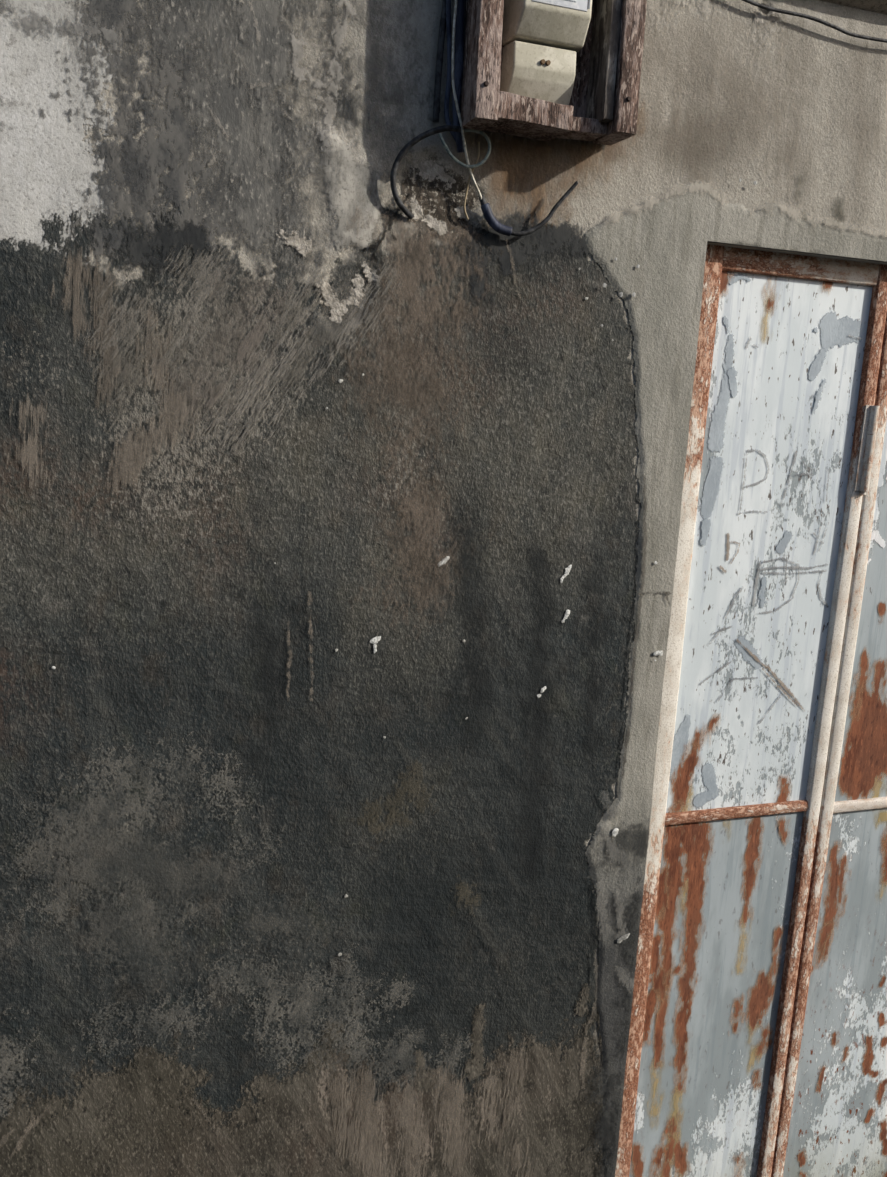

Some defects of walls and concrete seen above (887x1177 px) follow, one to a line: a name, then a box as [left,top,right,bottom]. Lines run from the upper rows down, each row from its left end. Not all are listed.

water stain [50,0,400,494]
water stain [8,394,56,499]
water stain [587,791,649,1177]
corrosion [632,716,719,1177]
corrosion [736,816,764,972]
corrosion [733,927,783,1088]
corrosion [777,777,790,803]
corrosion [811,843,847,972]
corrosion [839,649,887,800]
corrosion [878,811,887,886]
water stain [476,1038,537,1177]
corrosion [862,1012,887,1156]